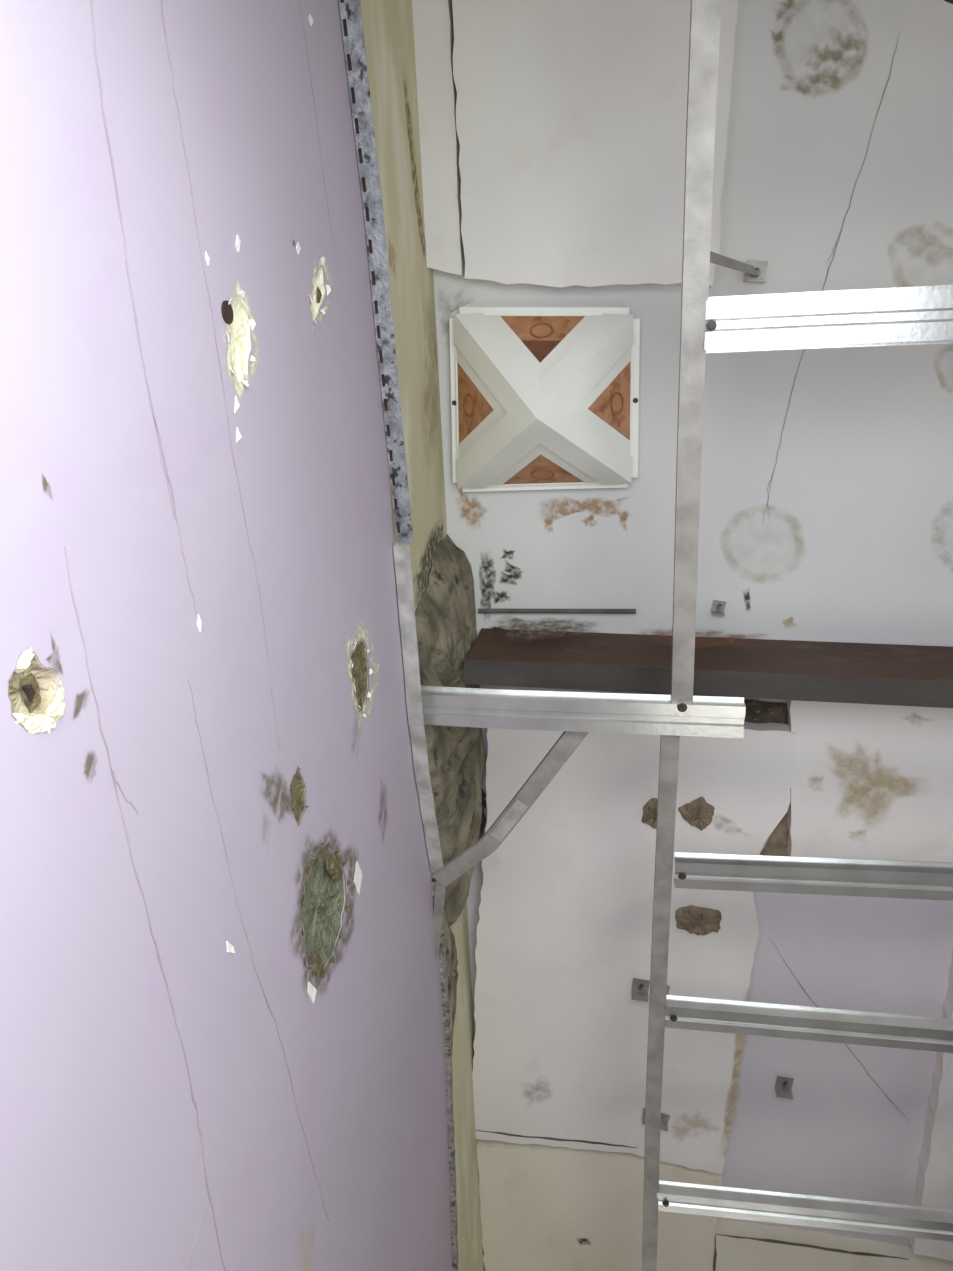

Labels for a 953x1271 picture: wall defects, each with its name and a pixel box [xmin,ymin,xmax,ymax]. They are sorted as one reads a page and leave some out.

crack [90,0,198,619]
crack [161,0,281,751]
peeling [221,283,257,442]
spalling [8,638,65,734]
spalling [346,623,379,728]
damp [480,550,521,608]
peeling [415,526,636,688]
corrosion [545,500,627,525]
corrosion [695,631,747,647]
peeling [424,725,486,866]
damp [841,759,911,817]
spalling [296,836,363,1004]